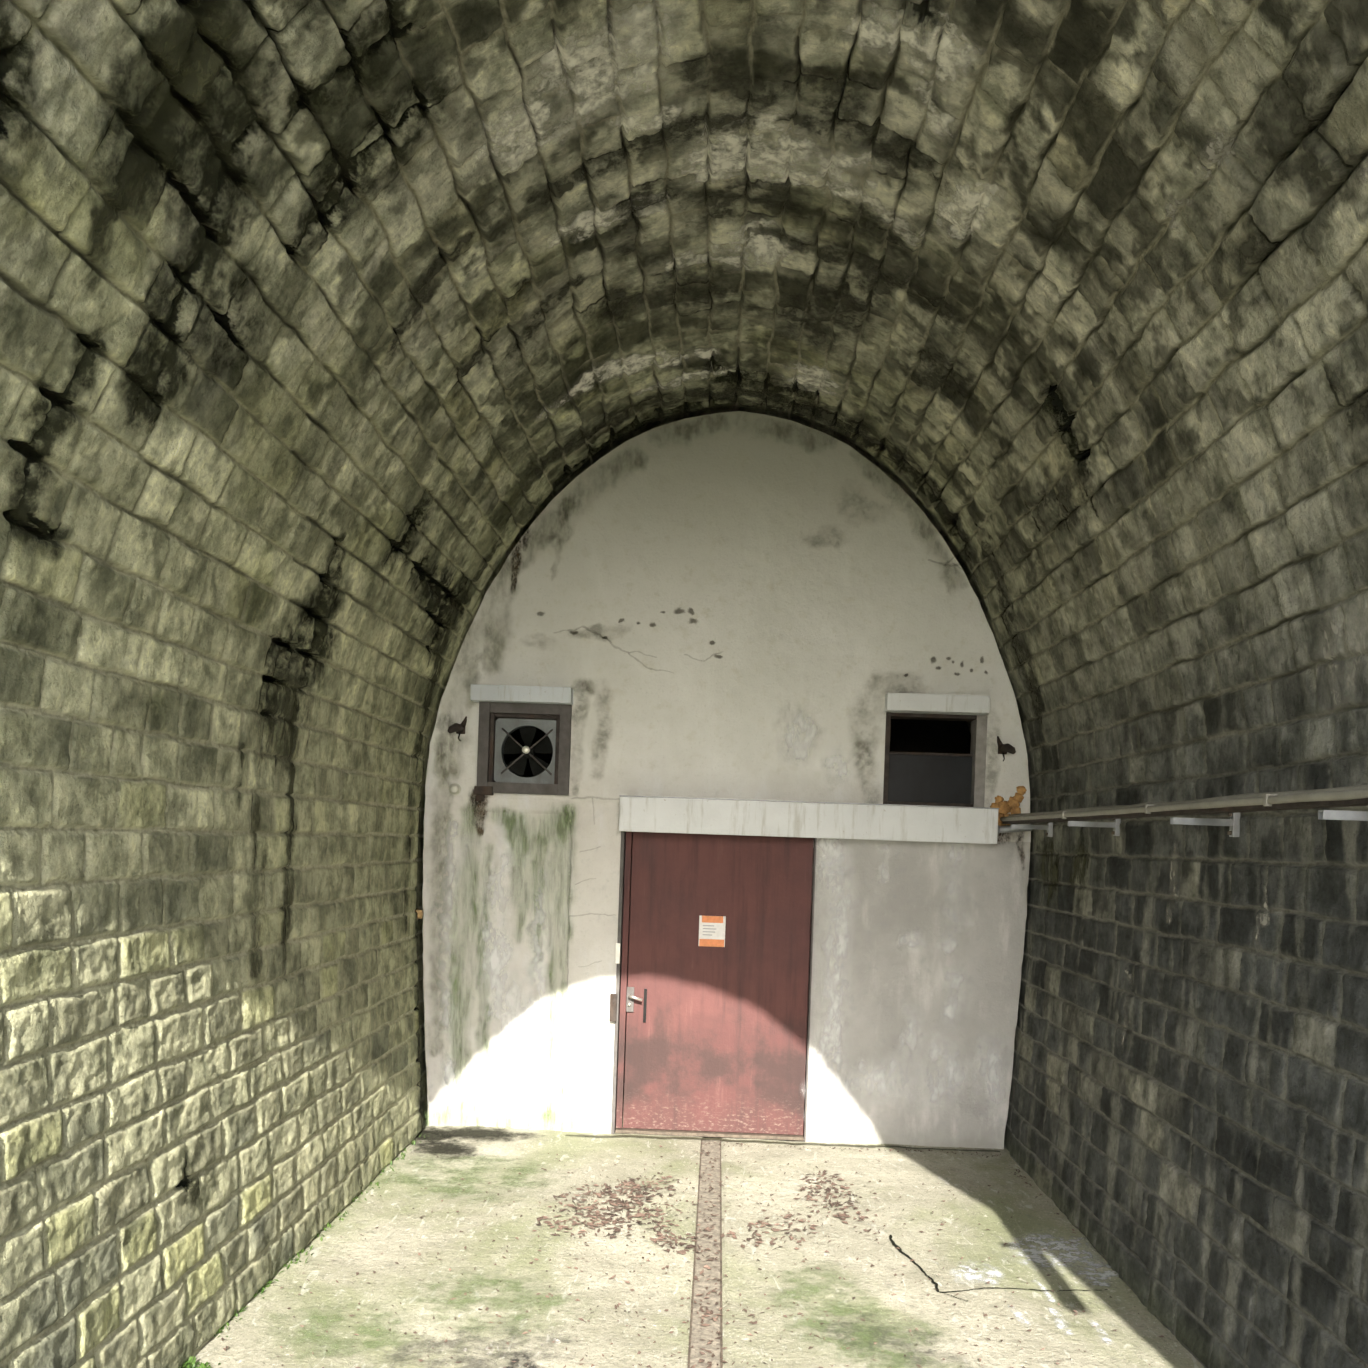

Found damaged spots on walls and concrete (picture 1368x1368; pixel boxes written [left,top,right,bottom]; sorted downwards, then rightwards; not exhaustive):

crack [0,0,447,557]
crack [1039,379,1091,480]
crack [383,493,471,662]
corrosion [471,790,487,835]
water stain [509,822,559,941]
water stain [471,871,563,1071]
crack [889,1235,1108,1301]